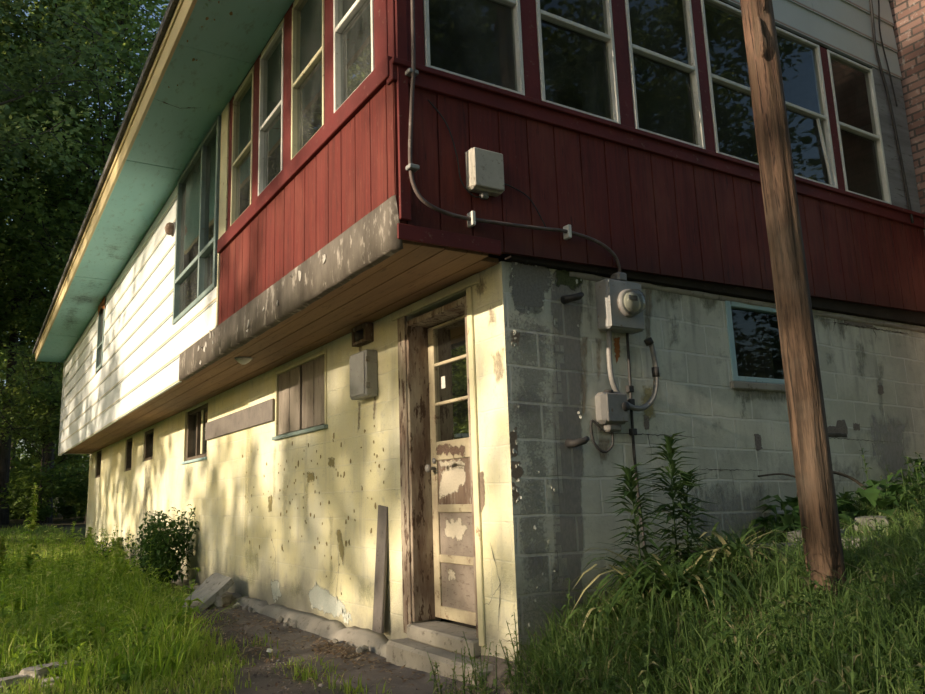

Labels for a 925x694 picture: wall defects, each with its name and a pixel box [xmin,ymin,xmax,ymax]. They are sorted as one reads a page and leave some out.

peeling [509,262,583,629]
spalling [827,420,860,438]
peeling [247,443,345,525]
peeling [314,511,356,565]
peeling [309,583,352,624]